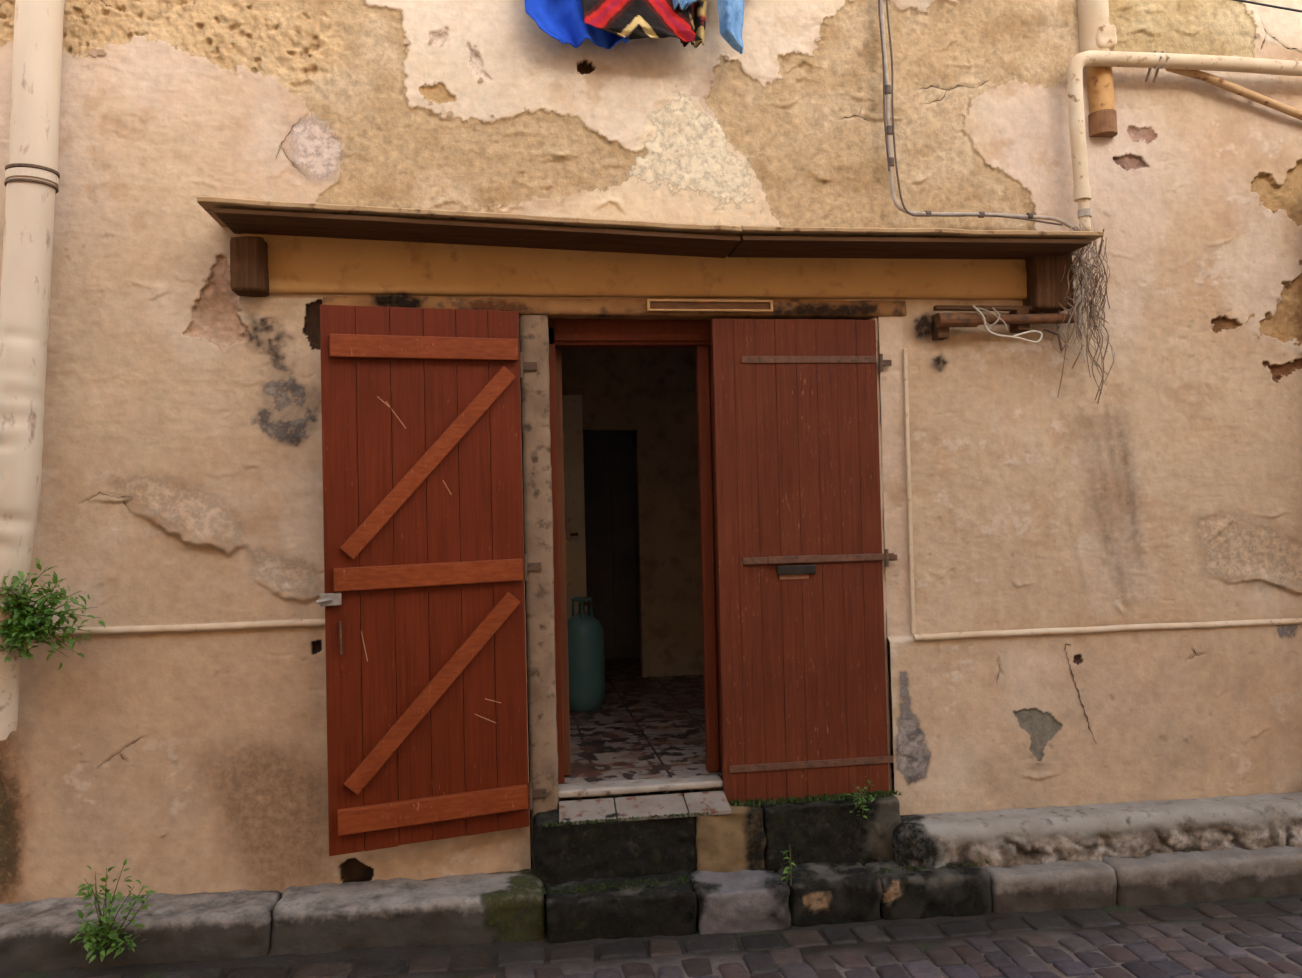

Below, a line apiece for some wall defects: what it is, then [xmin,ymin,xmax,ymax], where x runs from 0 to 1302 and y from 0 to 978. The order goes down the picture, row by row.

flaking render [0,0,15,46]
flaking render [62,0,1086,231]
flaking render [1113,126,1157,171]
flaking render [1251,161,1302,225]
flaking render [183,256,251,351]
flaking render [1211,317,1240,332]
flaking render [1260,258,1302,382]
leakage [249,318,321,446]
peeling [1014,709,1062,765]